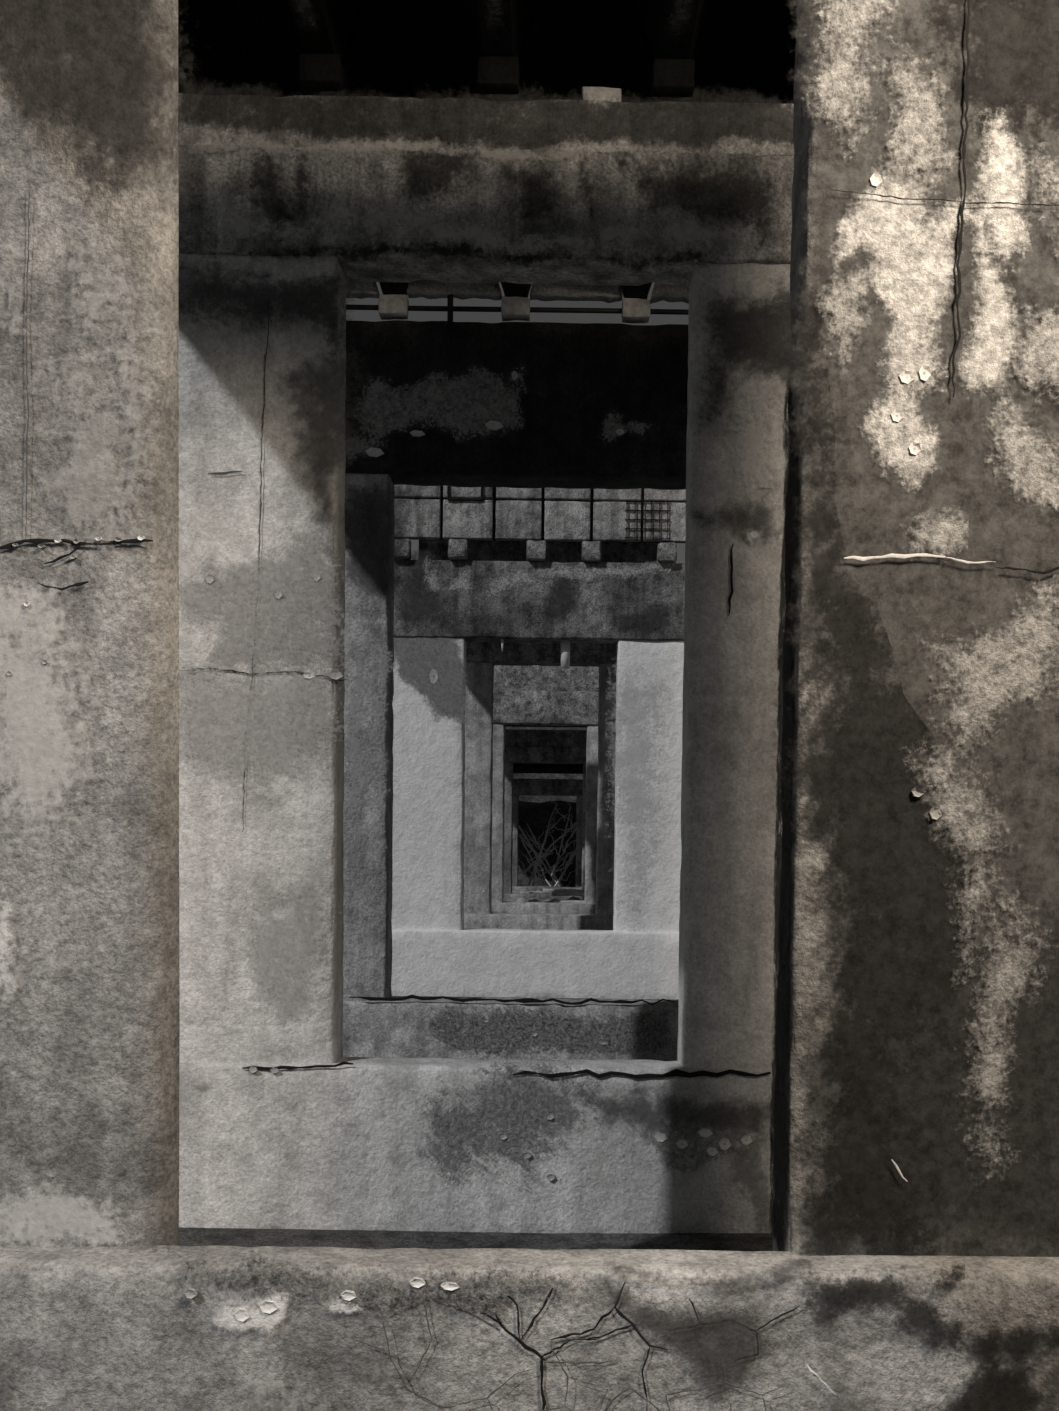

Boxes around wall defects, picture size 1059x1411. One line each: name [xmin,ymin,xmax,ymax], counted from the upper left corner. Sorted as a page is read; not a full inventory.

water stain [589,0,1059,1411]
crack [242,1061,353,1074]
crack [513,1069,771,1079]
crack [351,1279,837,1411]